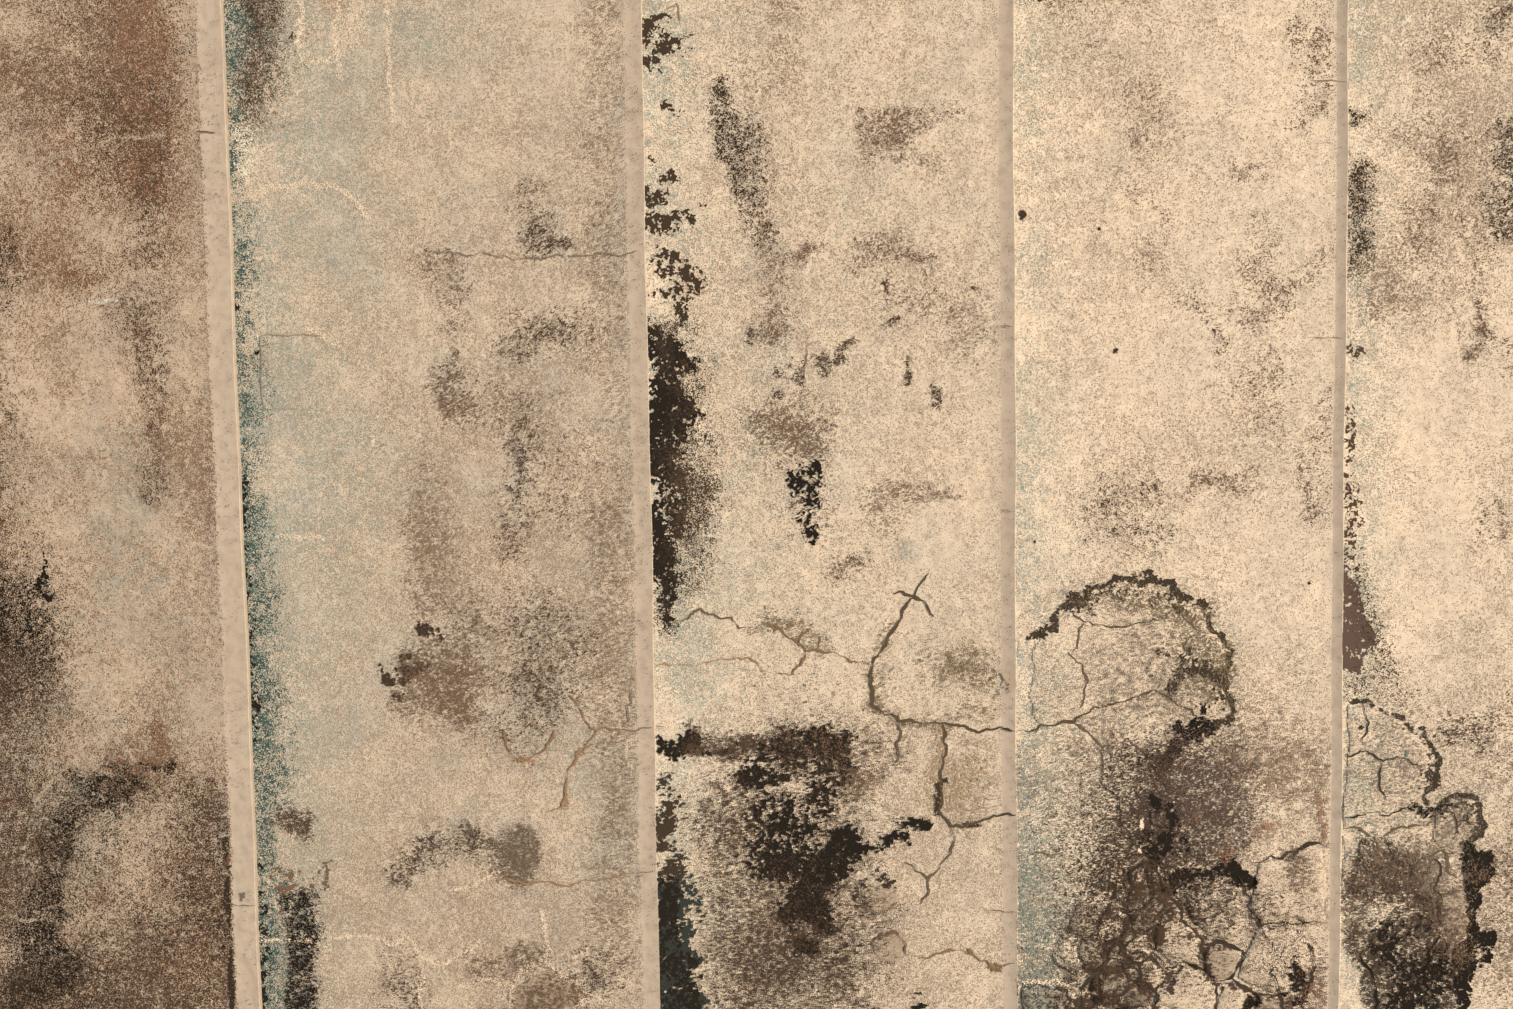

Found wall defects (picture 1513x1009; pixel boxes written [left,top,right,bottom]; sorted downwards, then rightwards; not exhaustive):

mould [642,13,695,74]
damp [701,74,832,351]
damp [645,155,732,645]
damp [785,452,824,546]
damp [0,548,96,733]
damp [0,755,177,1009]
damp [221,837,237,1009]
damp [655,619,1003,1009]
crack [503,573,1476,1009]
spalling [1120,706,1284,899]